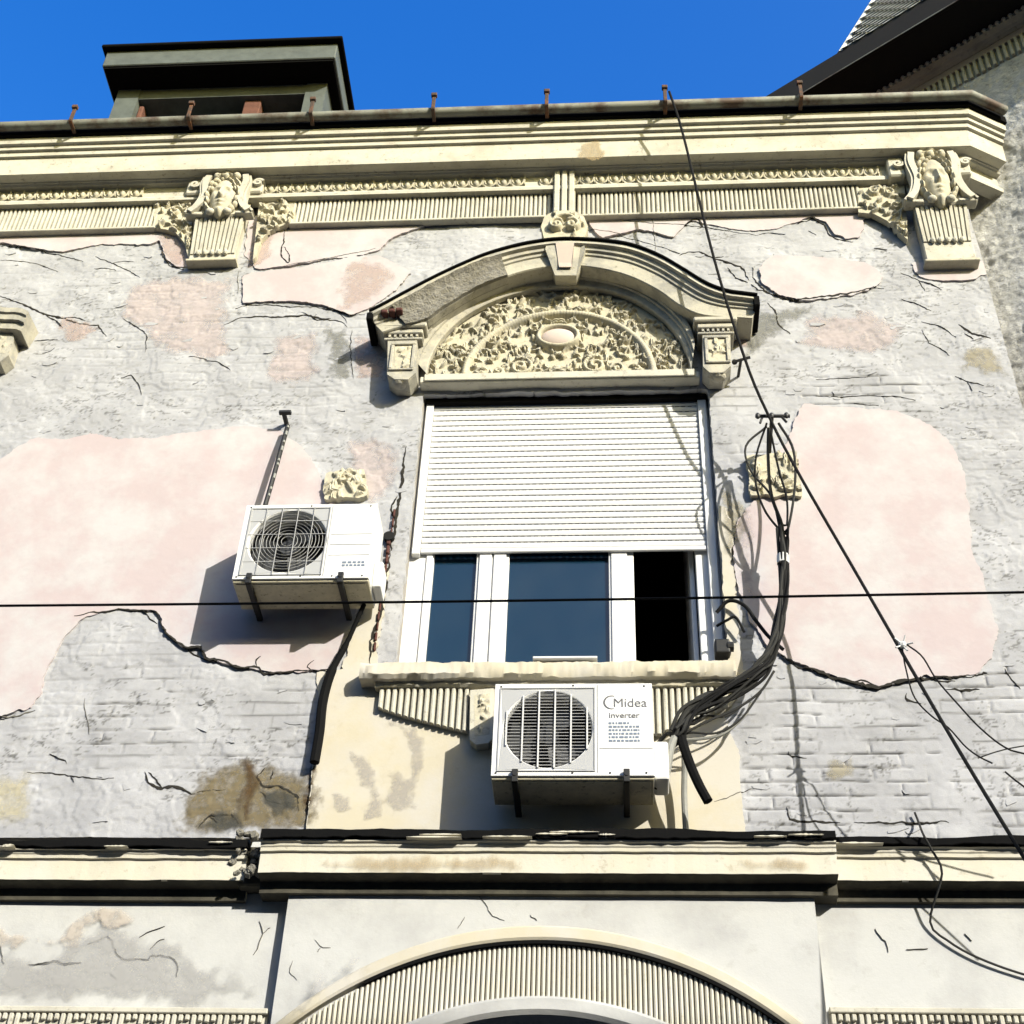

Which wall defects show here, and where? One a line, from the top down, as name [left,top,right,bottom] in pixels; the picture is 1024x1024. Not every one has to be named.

crack [2,245,139,277]
crack [281,231,375,265]
crack [1,296,148,353]
crack [224,270,365,374]
crack [588,217,991,390]
crack [816,377,916,406]
spalling [0,209,1024,838]
damp [186,761,315,831]
crack [0,926,178,976]